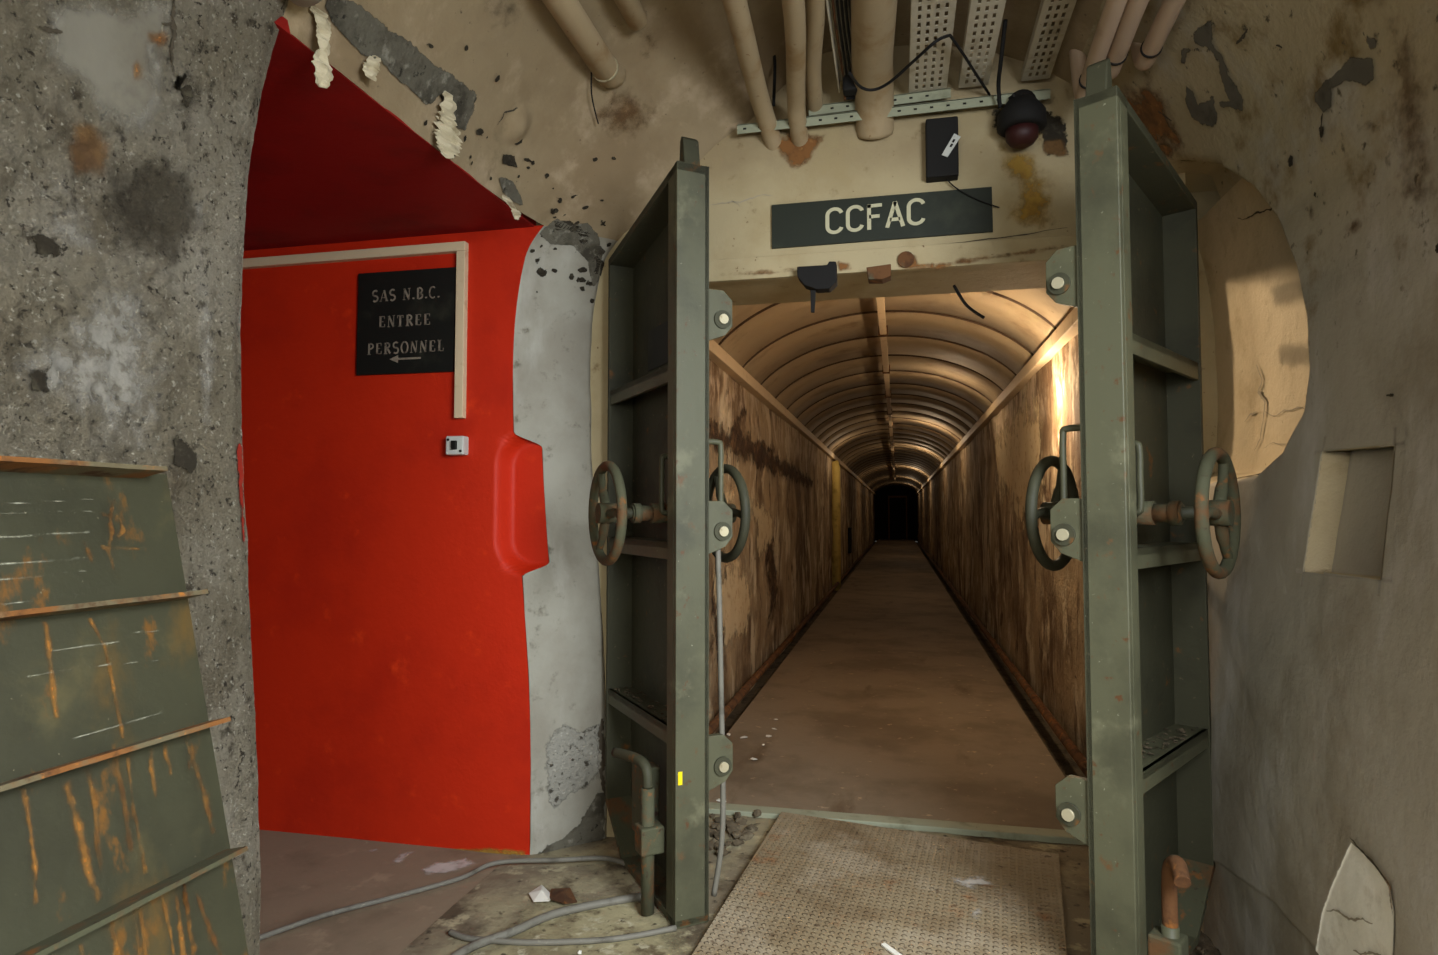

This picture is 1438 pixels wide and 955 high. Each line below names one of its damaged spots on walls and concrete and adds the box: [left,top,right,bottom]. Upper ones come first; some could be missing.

spalling [309,0,488,165]
peeling [1181,21,1243,127]
peeling [1315,33,1376,138]
rust [779,135,822,166]
water stain [1006,154,1050,221]
water stain [710,571,726,653]
water stain [766,537,778,627]